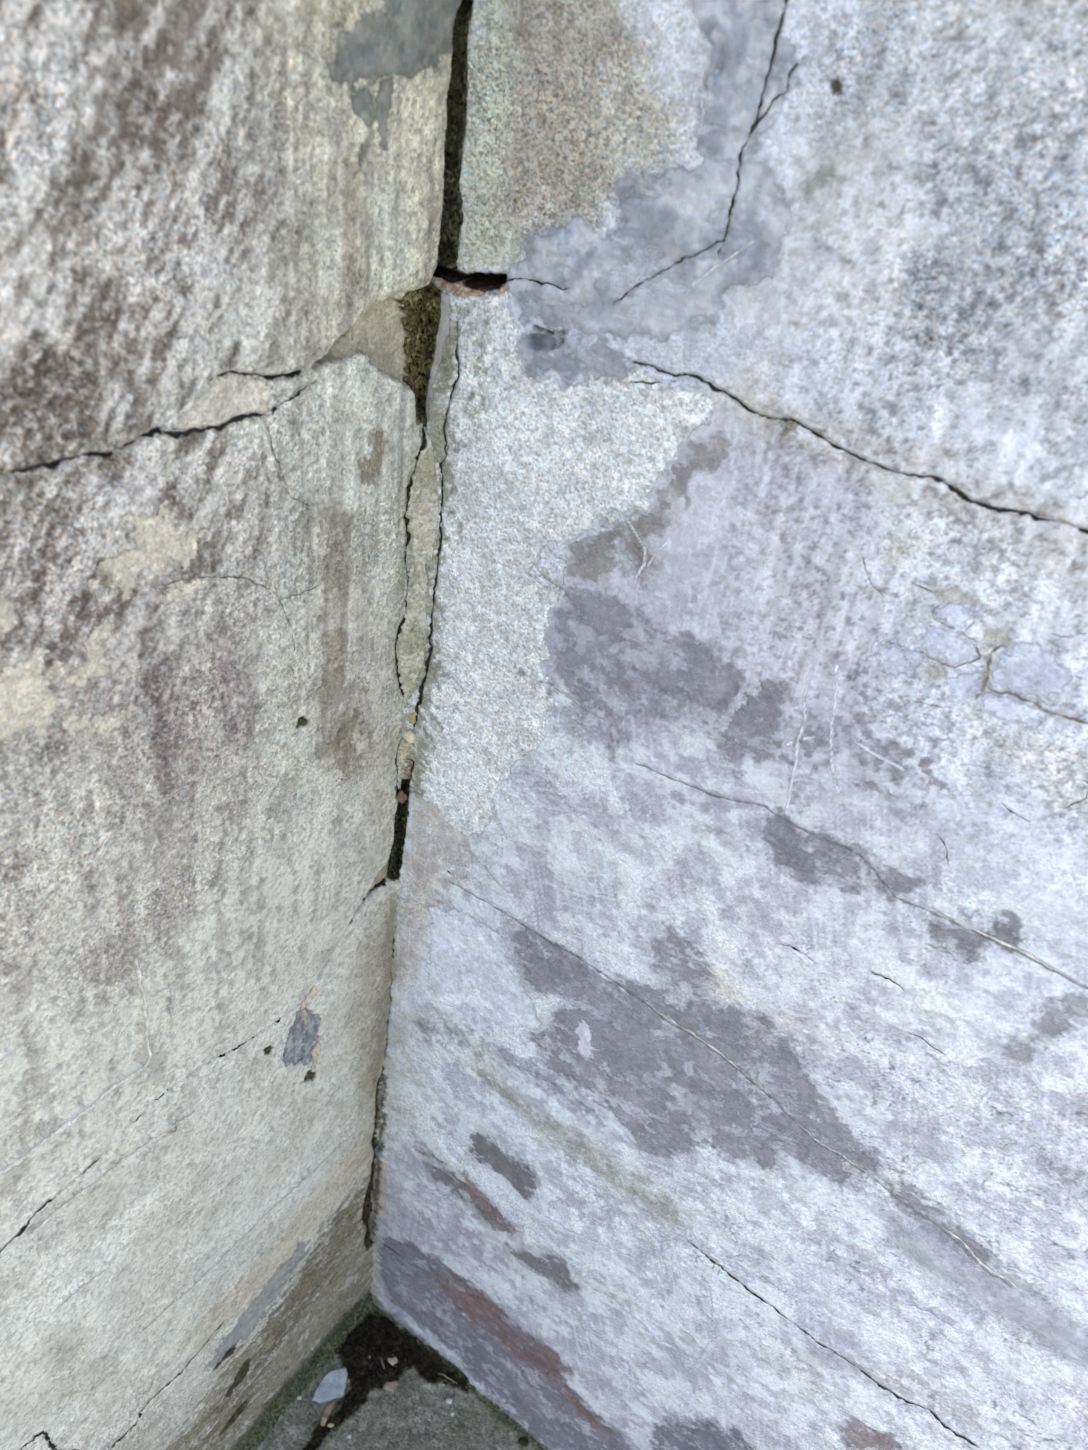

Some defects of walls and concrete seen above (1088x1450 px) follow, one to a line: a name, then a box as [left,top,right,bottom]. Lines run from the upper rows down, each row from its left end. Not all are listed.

crack [616,0,799,302]
crack [395,321,459,791]
leakage [554,438,837,770]
crack [630,361,1088,540]
leakage [854,714,947,795]
crack [21,1431,75,1450]
crack [0,1152,107,1253]
crack [371,938,408,1264]
leakage [167,1175,630,1450]
leakage [421,1151,580,1291]
leakage [469,1133,536,1200]
leakage [502,927,880,1184]